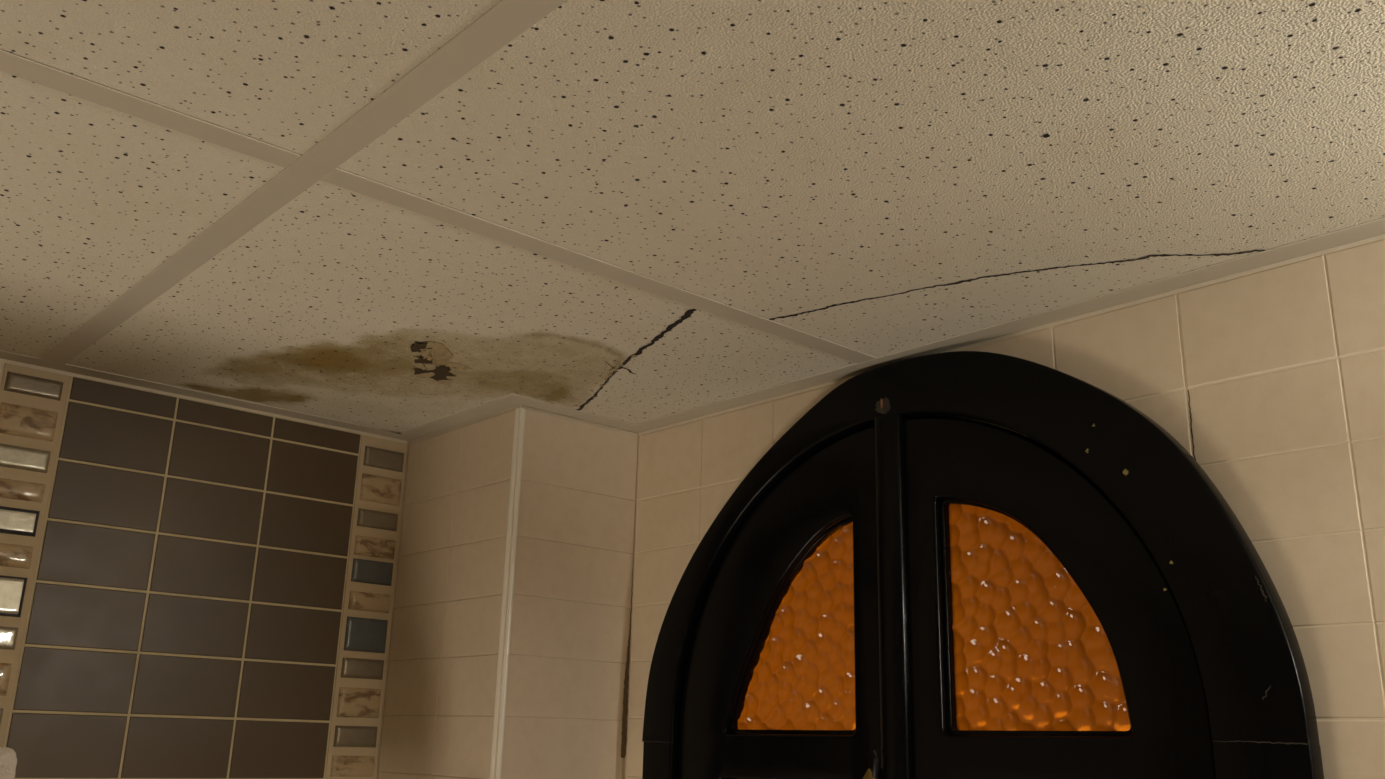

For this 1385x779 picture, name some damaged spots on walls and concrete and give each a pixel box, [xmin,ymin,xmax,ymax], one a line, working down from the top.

crack [769,250,1265,320]
leakage [187,338,417,402]
crack [577,309,696,410]